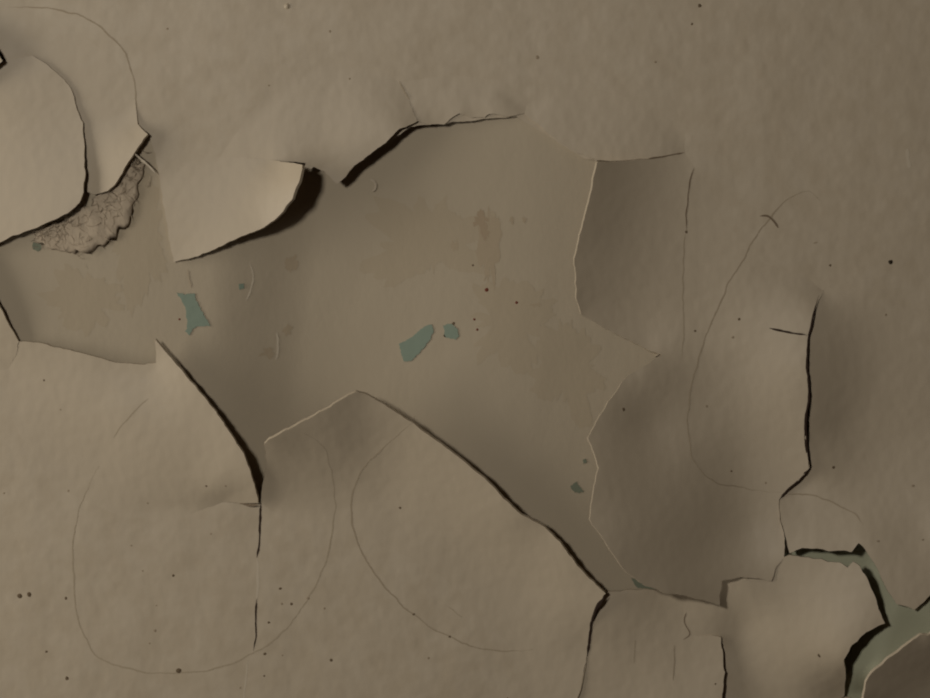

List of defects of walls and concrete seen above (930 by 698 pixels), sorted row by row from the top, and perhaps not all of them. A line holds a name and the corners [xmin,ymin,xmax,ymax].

crack [72,417,532,674]
flaking render [0,34,725,698]
peeling [573,153,824,355]
crack [648,152,862,523]
peeling [587,279,930,698]